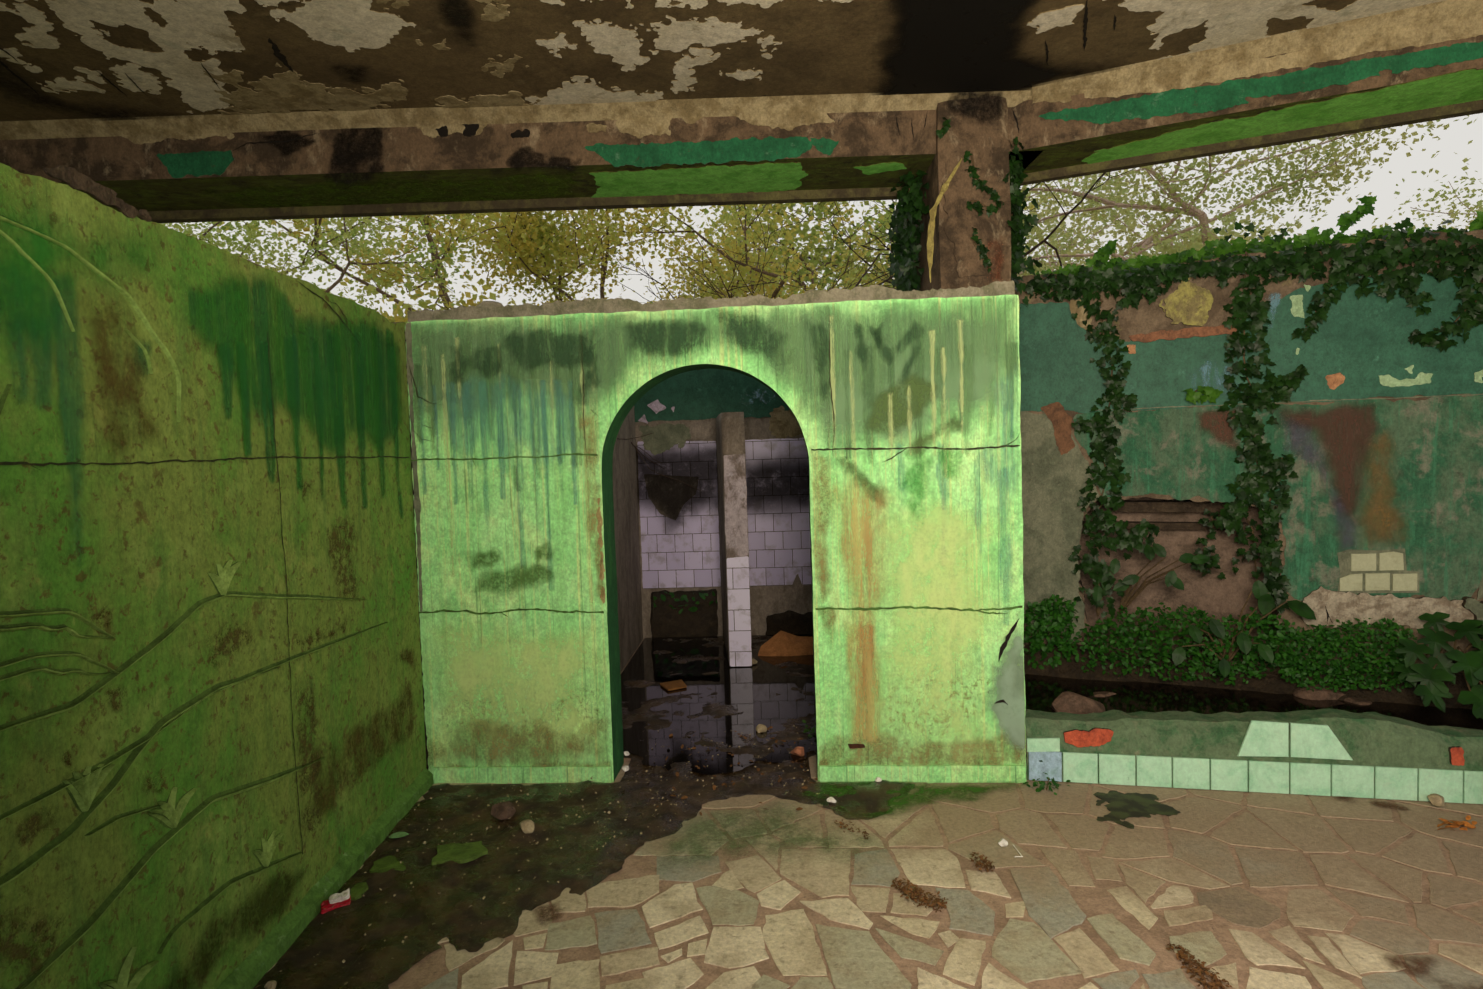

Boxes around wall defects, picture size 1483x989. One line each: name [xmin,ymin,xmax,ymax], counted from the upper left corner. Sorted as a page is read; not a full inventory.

flaking render [42,165,152,222]
peeling [0,0,451,179]
leakage [325,127,383,184]
peeling [416,0,839,198]
leakage [877,0,1086,122]
peeling [1023,0,1483,164]
leakage [0,218,80,494]
crack [299,282,361,345]
leakage [190,281,1018,625]
crack [0,322,604,855]
corrosion [843,491,878,749]
flaking render [1301,548,1483,629]